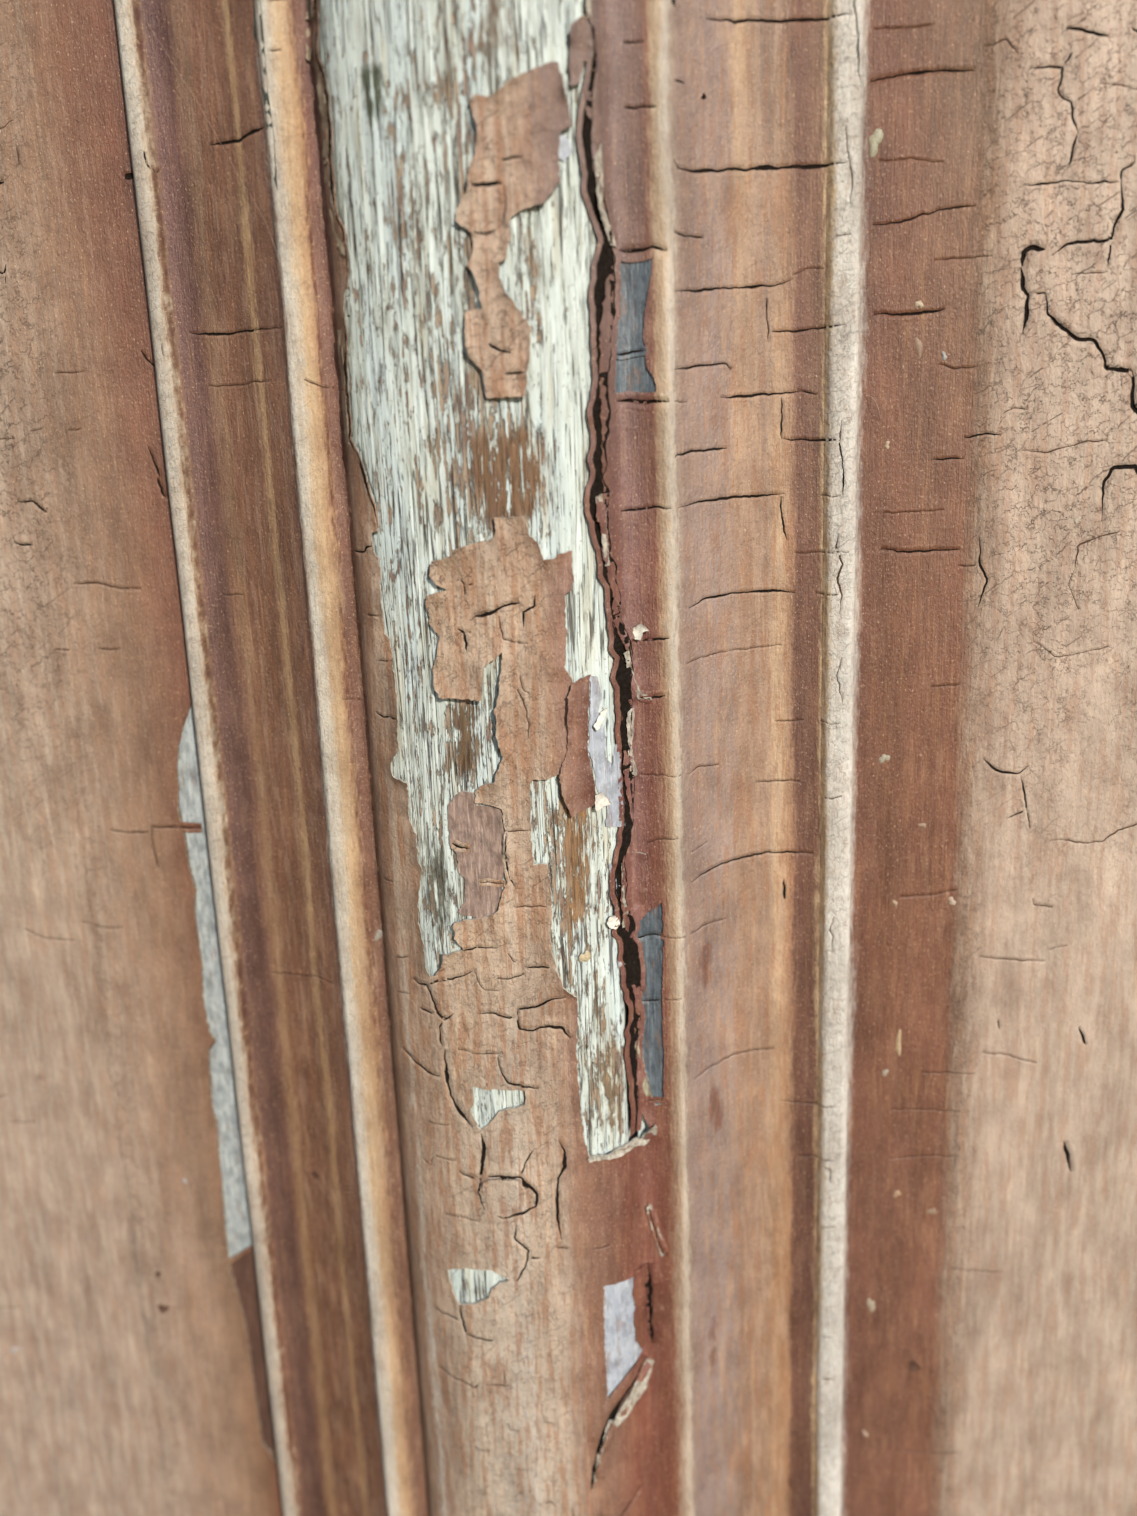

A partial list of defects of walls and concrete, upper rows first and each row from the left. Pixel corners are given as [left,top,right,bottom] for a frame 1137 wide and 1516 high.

crack [123,151,160,187]
crack [667,0,1137,611]
crack [12,494,49,551]
peeling [305,0,664,1163]
crack [576,25,992,1137]
crack [451,827,547,911]
crack [979,897,1068,965]
crack [980,755,1137,847]
peeling [178,704,277,1462]
crack [1075,1025,1090,1046]
crack [396,942,670,1516]
peeling [594,1277,654,1482]